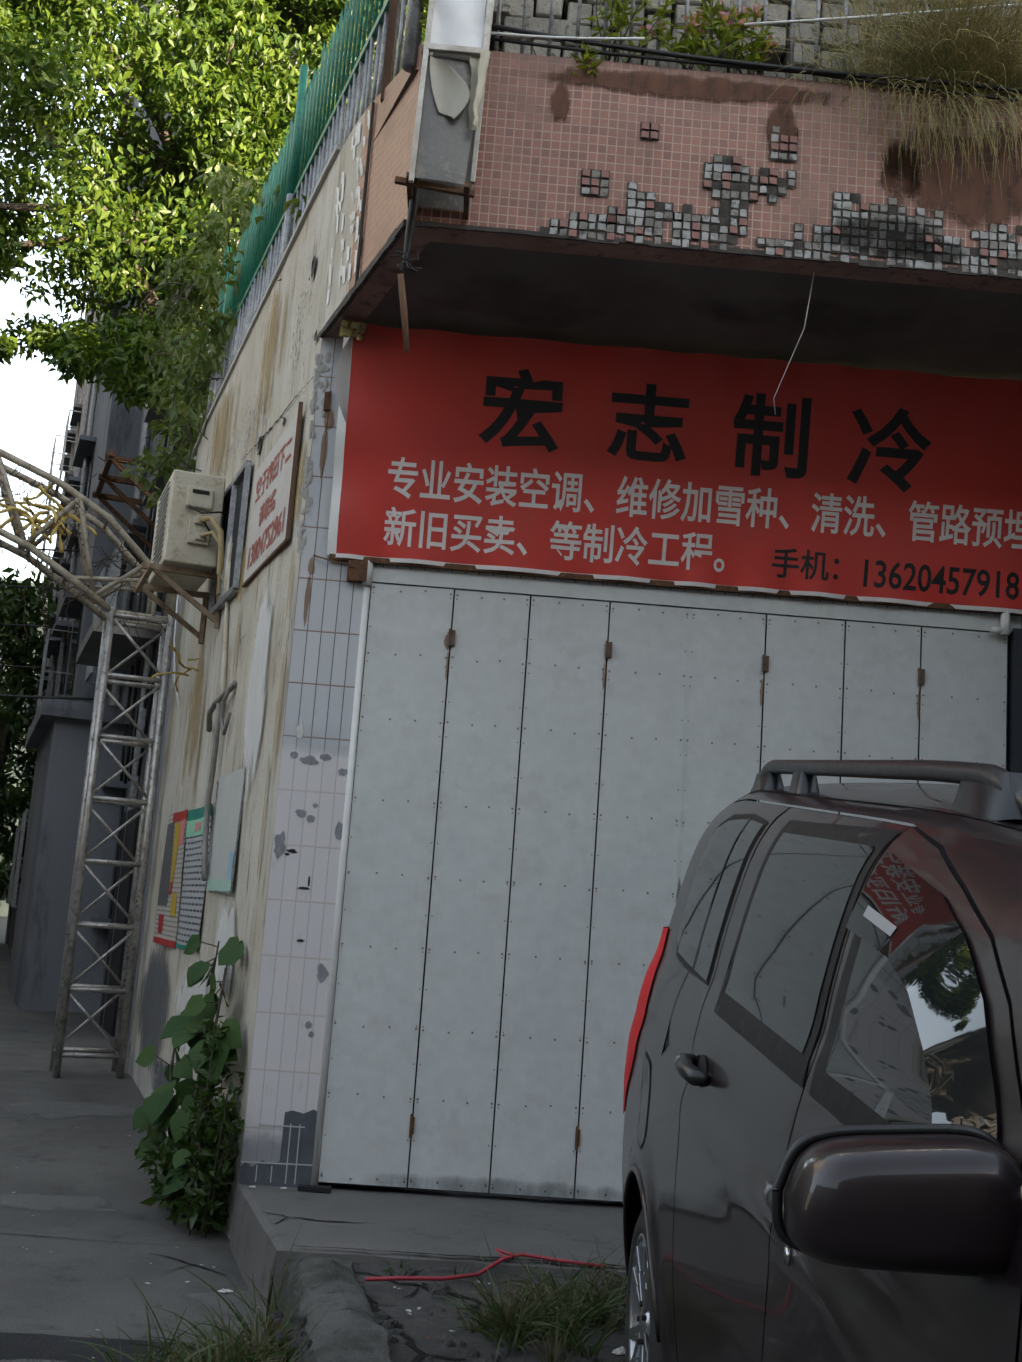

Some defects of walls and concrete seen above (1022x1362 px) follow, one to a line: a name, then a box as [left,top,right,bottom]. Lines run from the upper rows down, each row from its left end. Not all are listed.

spalling [640,122,660,141]
spalling [539,126,1022,276]
peeling [290,722,348,776]
peeling [295,803,318,822]
peeling [274,831,297,859]
peeling [335,822,343,840]